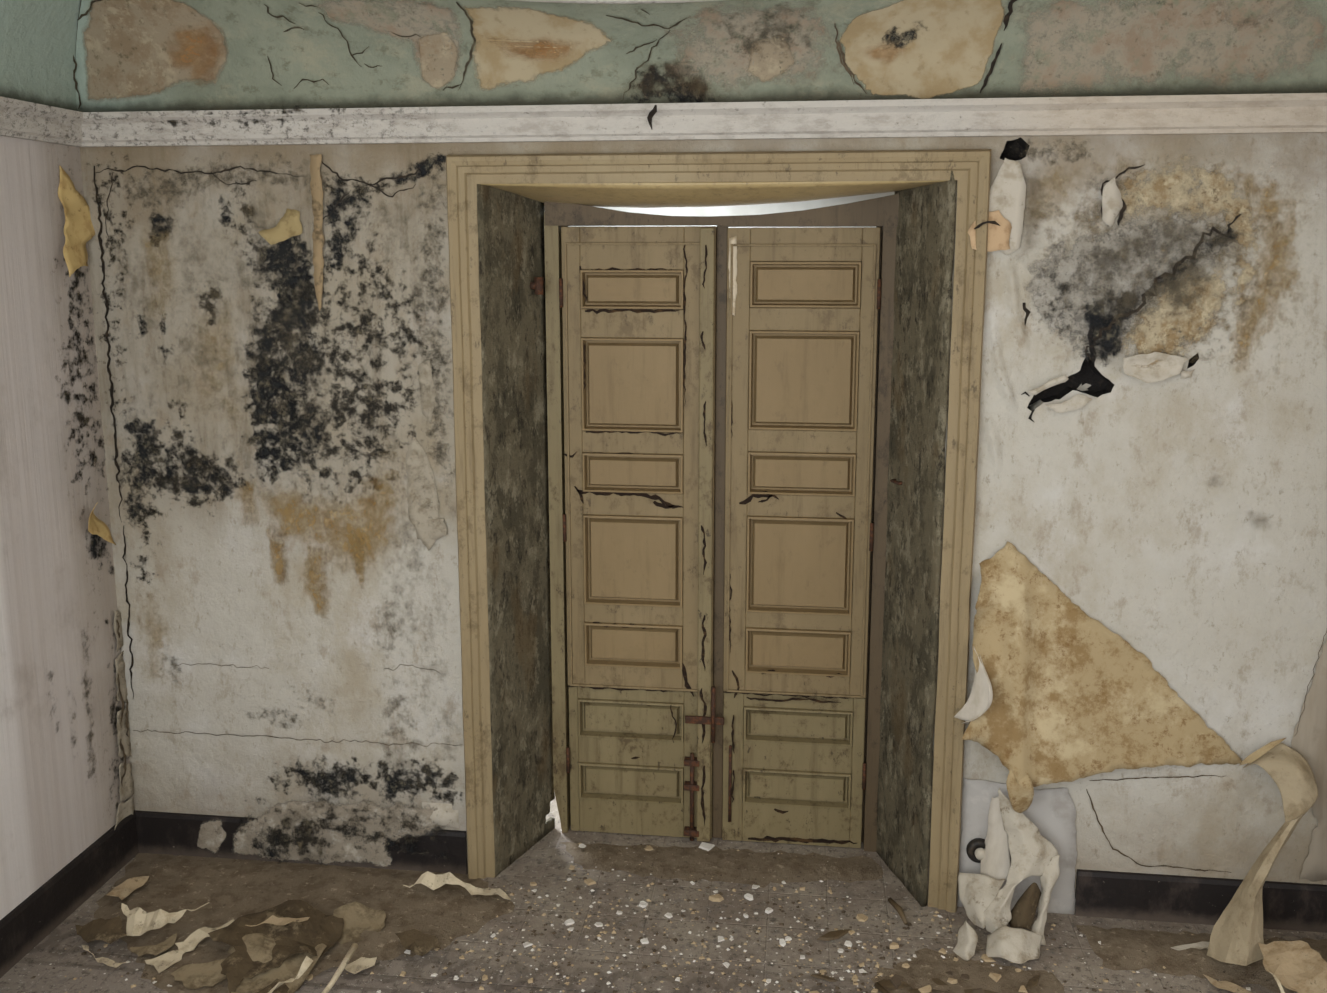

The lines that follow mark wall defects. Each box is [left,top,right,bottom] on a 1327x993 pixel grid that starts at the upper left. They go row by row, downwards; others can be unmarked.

spalling [674,0,1004,99]
peeling [1021,0,1325,90]
peeling [58,165,95,277]
water stain [1238,183,1294,359]
water stain [55,155,447,612]
water stain [110,668,125,735]
peeling [957,778,1010,907]
peeling [1001,787,1077,915]